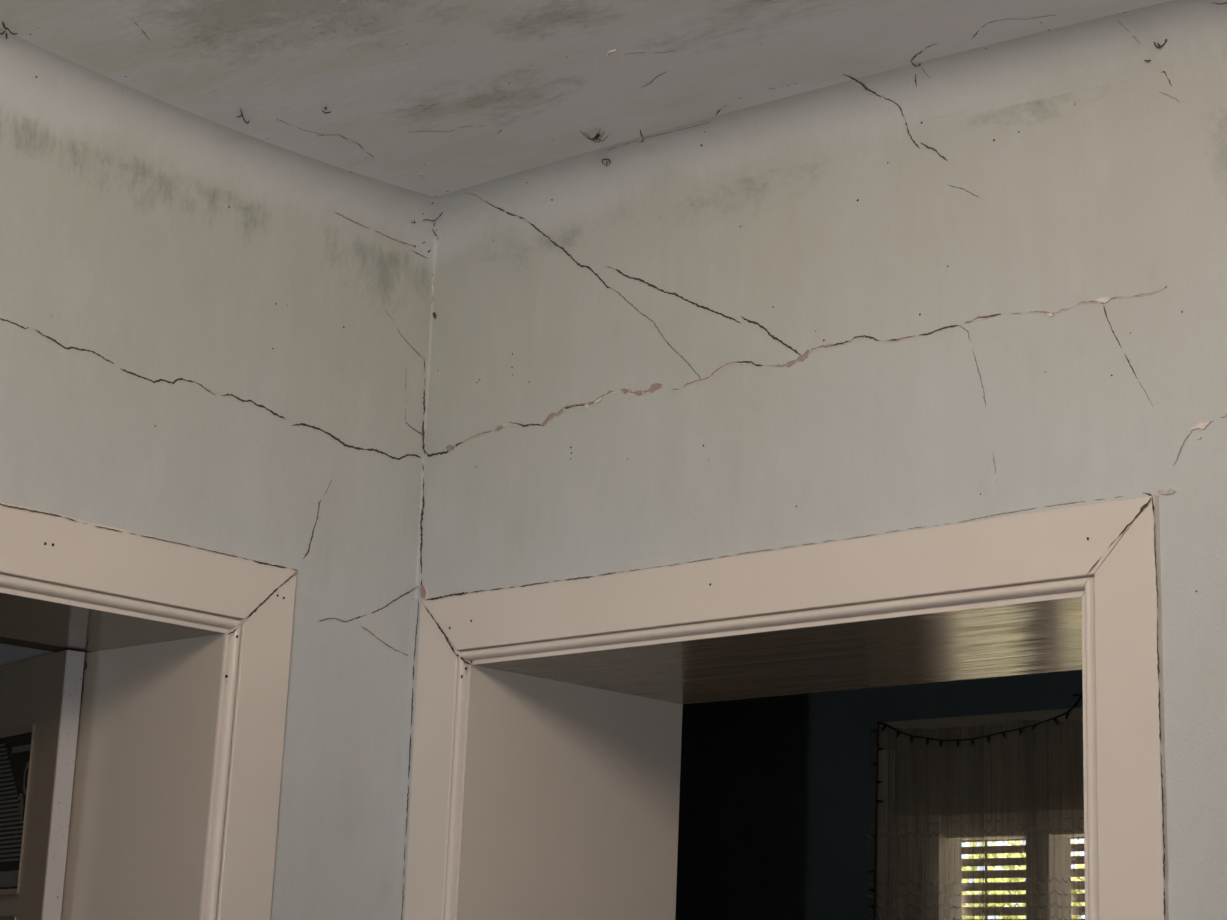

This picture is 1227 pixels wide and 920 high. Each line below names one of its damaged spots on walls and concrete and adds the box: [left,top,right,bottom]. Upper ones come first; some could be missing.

crack [843,43,979,198]
crack [1173,415,1227,466]
crack [0,192,1165,920]